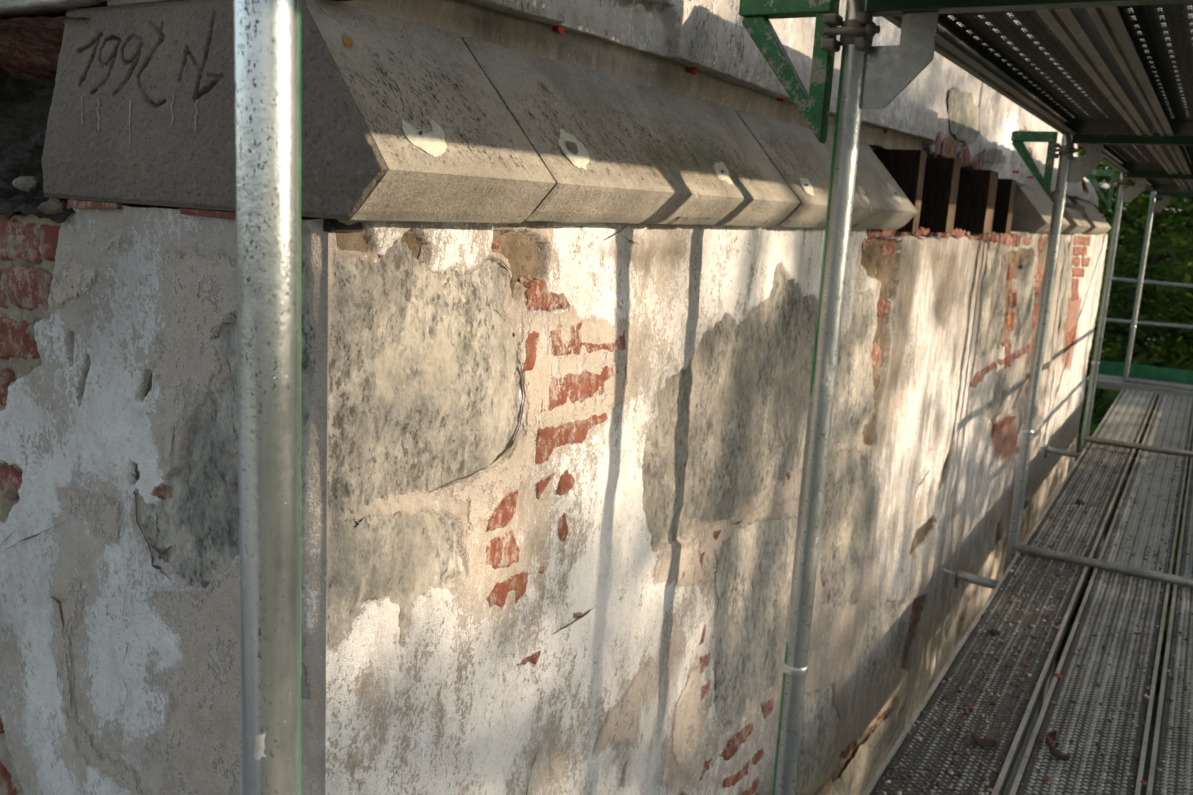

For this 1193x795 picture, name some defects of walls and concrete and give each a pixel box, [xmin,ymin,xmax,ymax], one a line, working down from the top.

flaking render [934,86,1006,170]
flaking render [0,213,129,411]
crack [429,258,526,493]
flaking render [861,227,1047,459]
flaking render [1058,236,1091,349]
flaking render [0,463,23,523]
crack [133,490,171,580]
flaking render [301,230,633,650]
flaking render [641,263,818,780]
spalling [938,443,953,490]
flaking render [516,650,541,667]
flaking render [722,748,764,795]